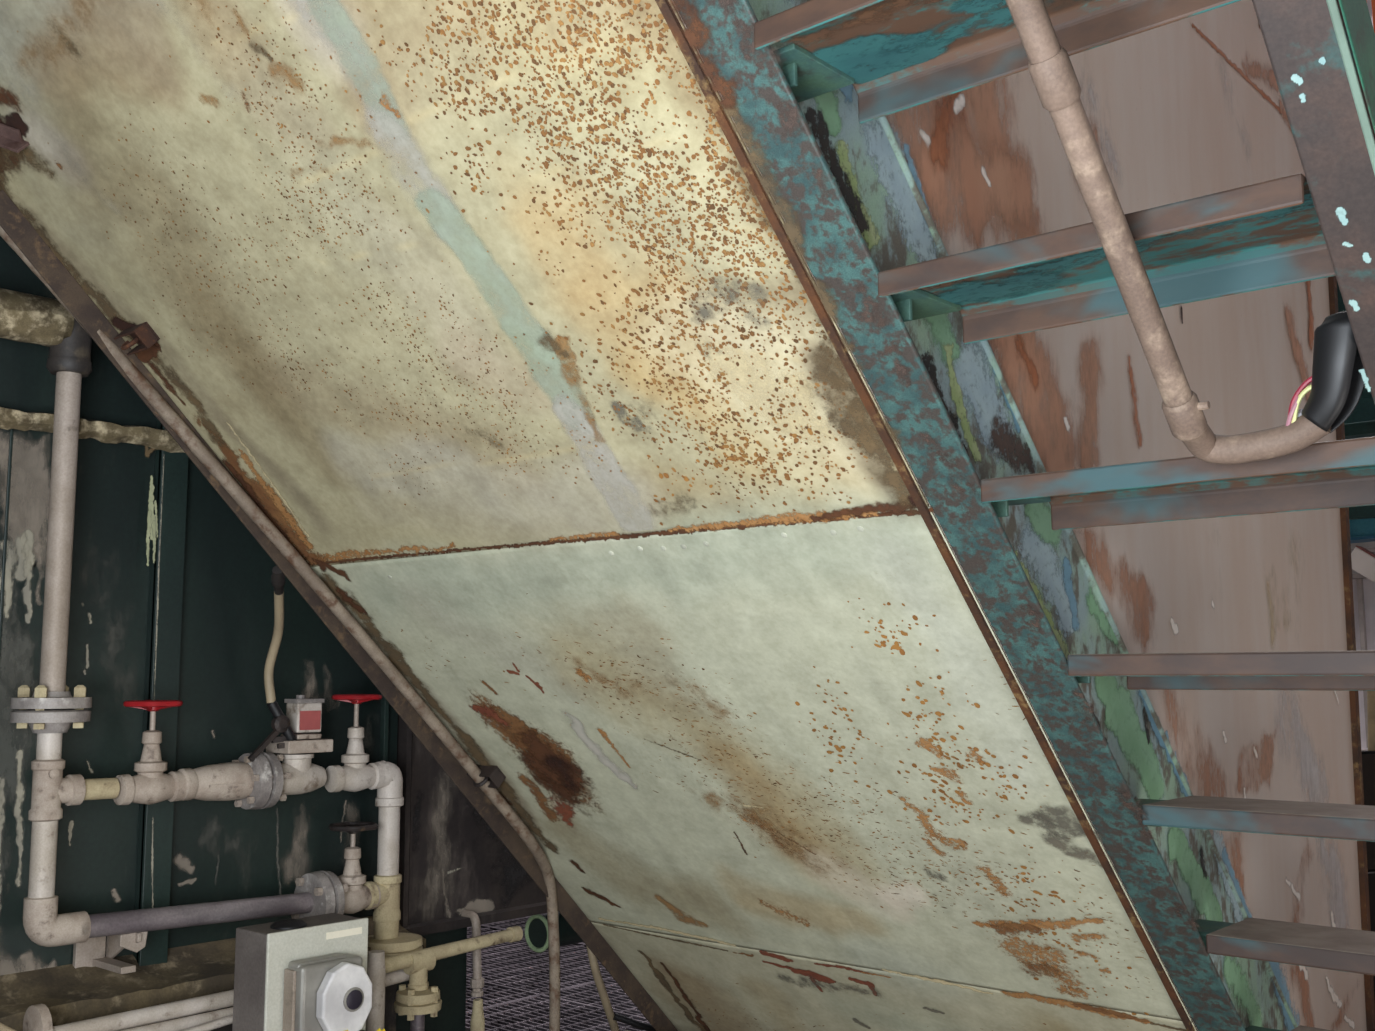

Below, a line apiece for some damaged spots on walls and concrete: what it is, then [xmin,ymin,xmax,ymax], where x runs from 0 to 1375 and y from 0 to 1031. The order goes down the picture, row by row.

corrosion [0,123,30,153]
corrosion [15,0,934,582]
damp [0,433,50,909]
peeling [154,457,164,696]
corrosion [469,598,1187,1031]
corrosion [1084,529,1153,647]
corrosion [1197,735,1274,797]
damp [0,952,56,976]